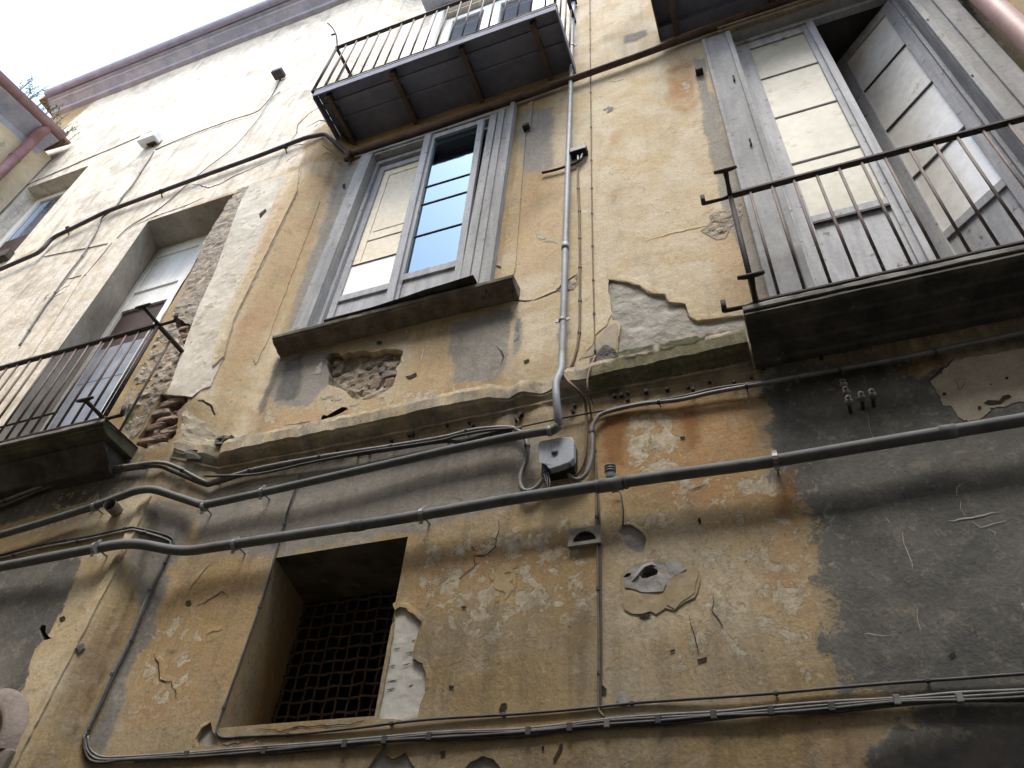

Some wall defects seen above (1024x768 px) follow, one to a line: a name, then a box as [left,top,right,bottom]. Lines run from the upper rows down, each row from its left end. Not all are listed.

spalling [123,186,249,462]
spalling [571,254,749,367]
spalling [314,340,417,420]
peeling [930,348,1024,422]
spalling [623,567,658,578]
crack [153,651,183,699]
spalling [377,602,432,720]
water stain [872,728,1024,768]